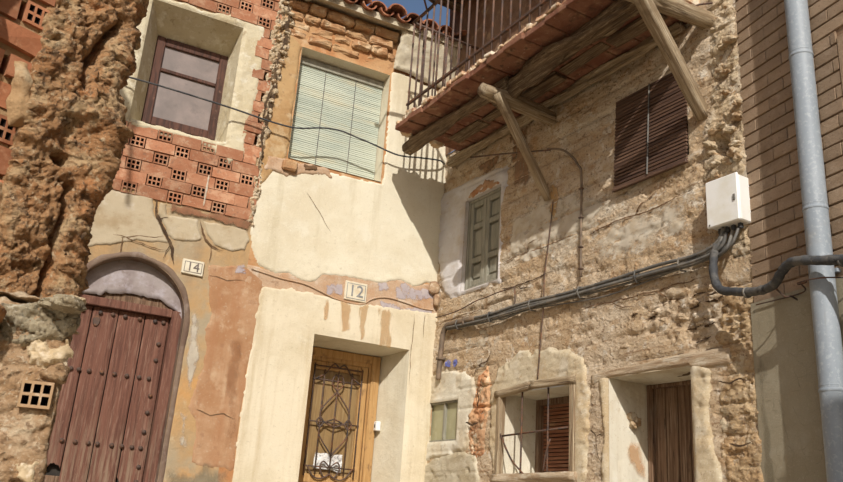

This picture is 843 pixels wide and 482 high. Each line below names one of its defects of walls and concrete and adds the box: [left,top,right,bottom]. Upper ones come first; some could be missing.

crack [113,200,174,263]
crack [200,221,222,260]
flaking render [188,265,440,471]